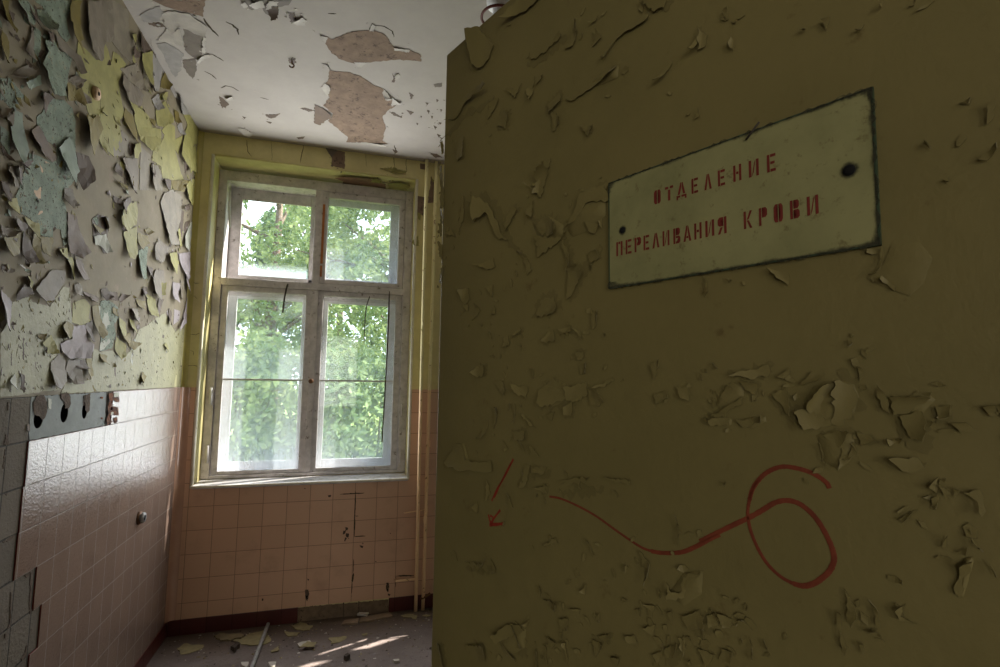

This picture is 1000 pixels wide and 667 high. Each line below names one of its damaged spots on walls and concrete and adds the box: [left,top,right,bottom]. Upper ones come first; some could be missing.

peeling [0,0,210,440]
peeling [239,0,674,288]
crack [340,491,363,597]